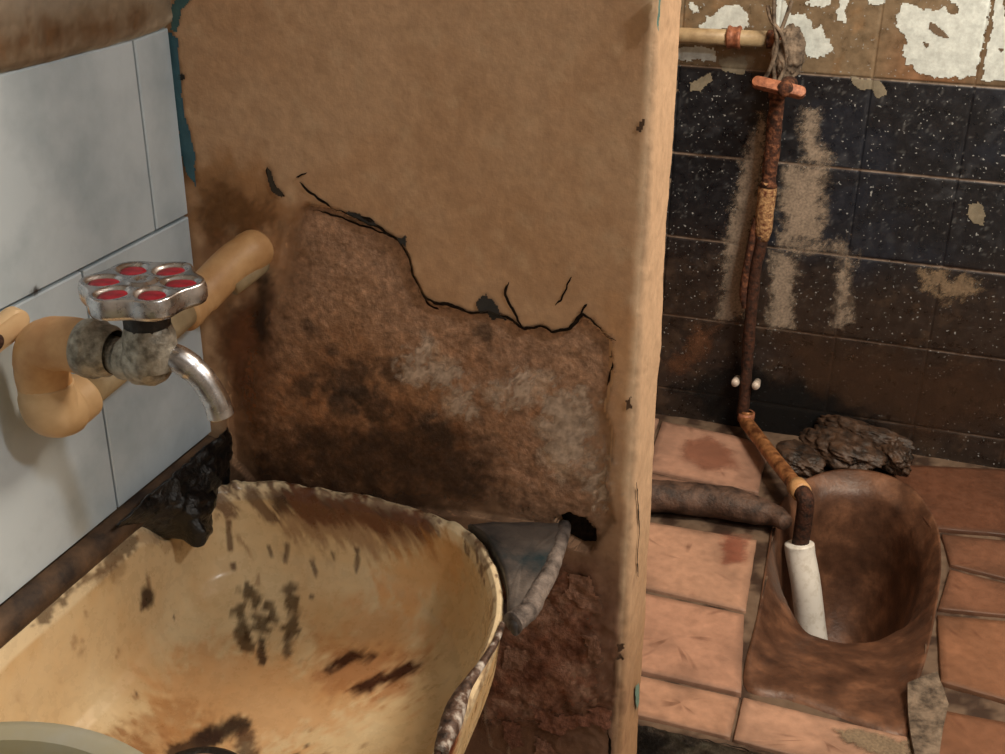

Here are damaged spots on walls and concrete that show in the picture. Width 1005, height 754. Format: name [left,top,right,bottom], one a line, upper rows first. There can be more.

peeling [678,45,748,92]
peeling [688,2,749,30]
peeling [776,0,849,59]
peeling [896,0,1005,82]
damp [716,112,766,321]
damp [765,109,853,330]
peeling [966,202,986,226]
peeling [239,205,613,527]
damp [395,338,480,420]
damp [258,425,490,501]
damp [539,385,608,510]
flaking render [480,564,625,754]